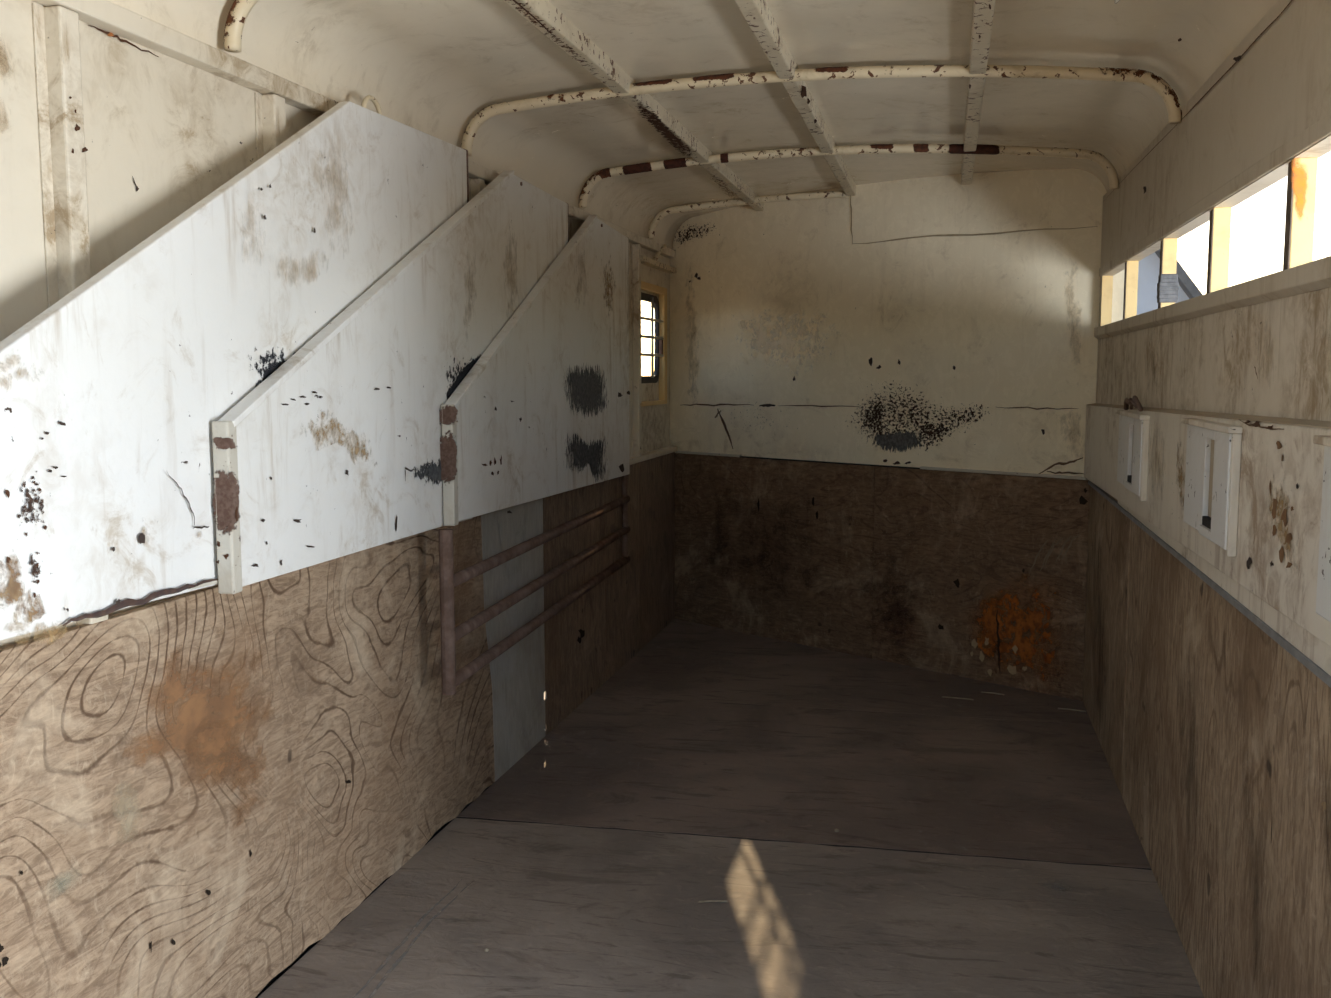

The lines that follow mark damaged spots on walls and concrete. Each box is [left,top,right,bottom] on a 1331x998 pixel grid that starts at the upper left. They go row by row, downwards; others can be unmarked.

rust [224,0,240,36]
rust [512,0,599,72]
rust [692,73,734,81]
rust [213,437,236,449]
rust [439,405,458,483]
rust [212,470,240,564]